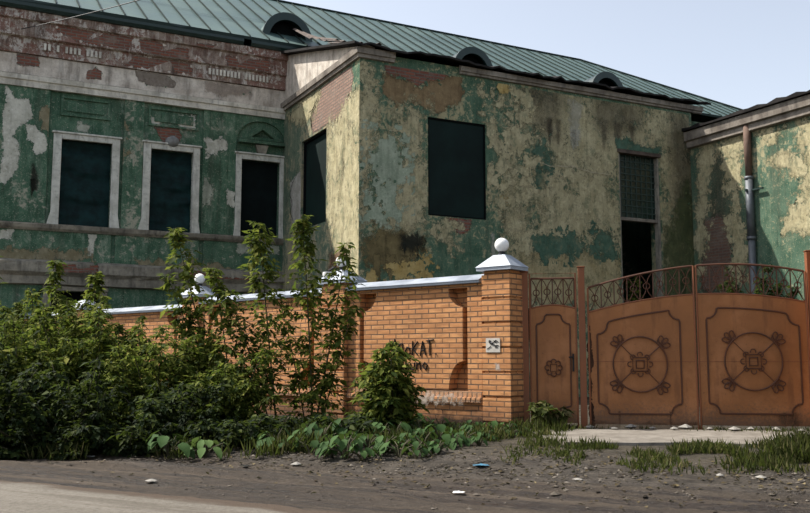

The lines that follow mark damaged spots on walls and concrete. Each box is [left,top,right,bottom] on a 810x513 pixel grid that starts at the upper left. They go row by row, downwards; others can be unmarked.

flaking render [16,54,40,67]
flaking render [56,26,218,88]
peeling [0,87,50,186]
peeling [285,61,472,282]
peeling [477,82,749,292]
peeling [754,117,810,237]
leakage [360,221,432,282]